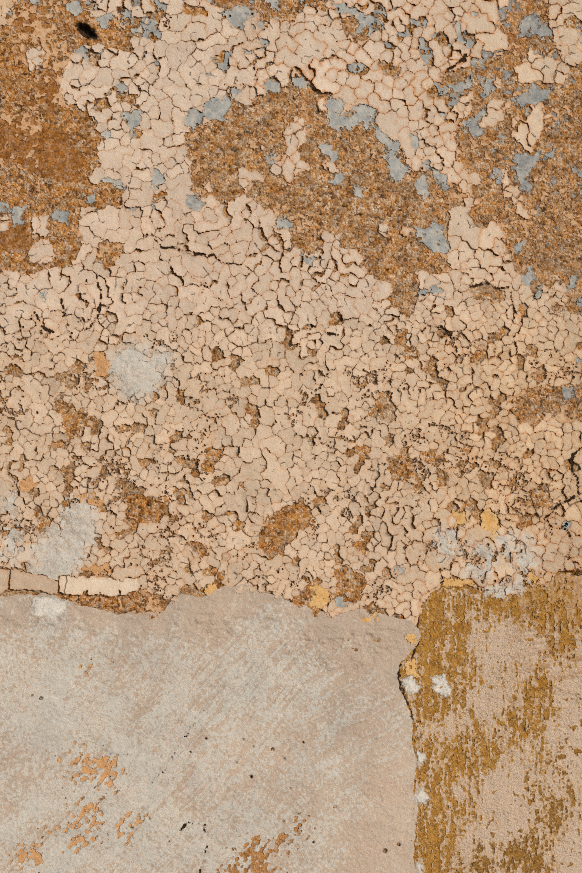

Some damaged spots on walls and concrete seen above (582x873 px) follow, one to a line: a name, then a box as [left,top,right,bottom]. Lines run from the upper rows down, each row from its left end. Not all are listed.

crack [445,54,467,73]
crack [33,298,65,333]
crack [85,273,102,330]
crack [154,239,234,301]
flaking render [0,0,582,582]
crack [469,281,522,342]
peeling [52,313,433,628]
crack [543,447,582,568]
peeling [376,380,582,873]